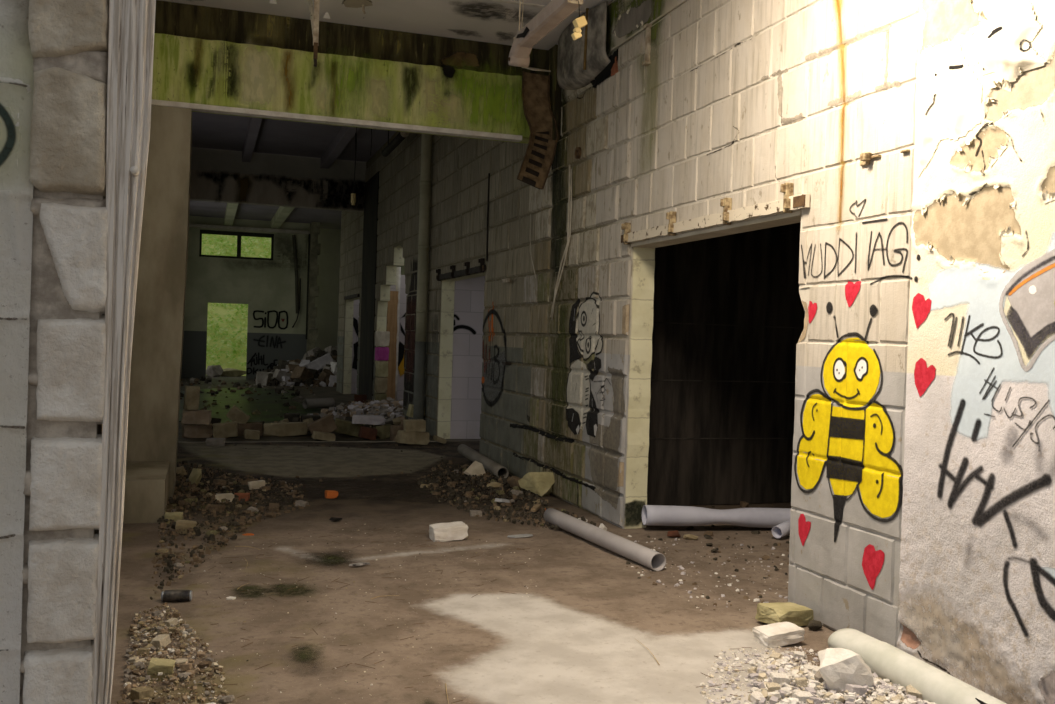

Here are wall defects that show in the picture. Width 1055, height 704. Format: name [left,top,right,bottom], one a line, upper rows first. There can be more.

water stain [403,68,419,107]
water stain [462,4,535,21]
peeling [590,0,652,88]
rust [834,0,845,222]
peeling [919,0,988,55]
peeling [913,51,1055,275]
crack [510,415,596,507]